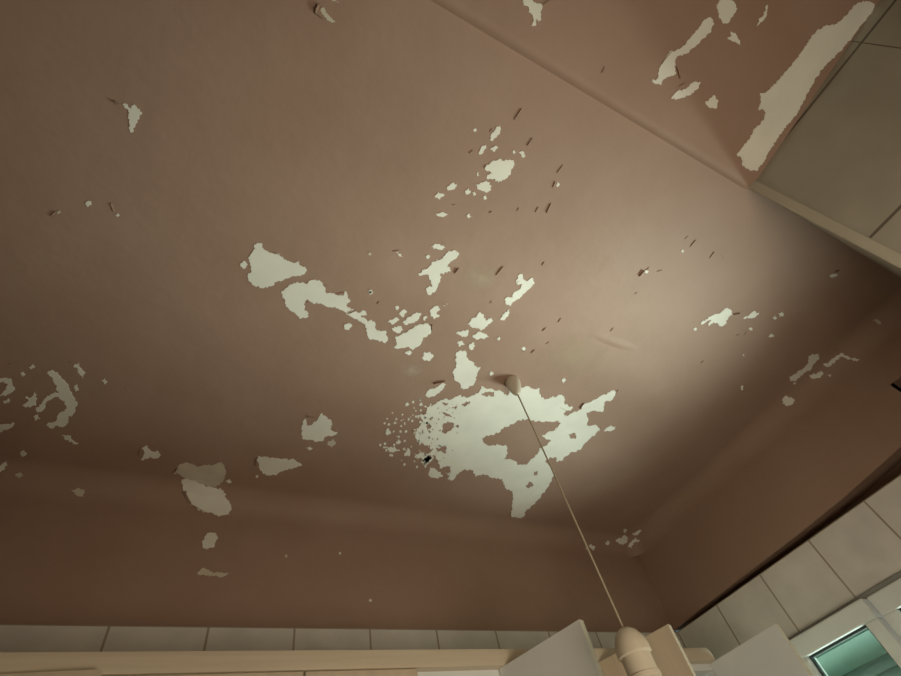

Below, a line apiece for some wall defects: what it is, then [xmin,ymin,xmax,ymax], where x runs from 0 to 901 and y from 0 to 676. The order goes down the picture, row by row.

peeling [523,0,550,26]
peeling [652,0,740,100]
peeling [737,1,875,171]
peeling [435,126,532,200]
peeling [240,243,446,361]
peeling [418,243,459,295]
peeling [694,308,759,336]
peeling [22,362,86,444]
peeling [173,462,232,517]
peeling [255,456,302,478]
peeling [301,413,337,450]
peeling [379,274,618,518]